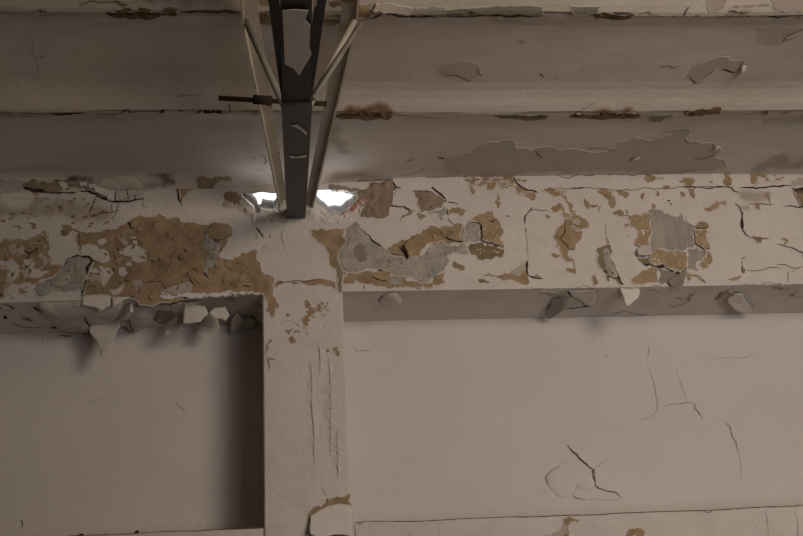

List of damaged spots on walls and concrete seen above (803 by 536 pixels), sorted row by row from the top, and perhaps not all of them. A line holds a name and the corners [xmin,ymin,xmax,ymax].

spalling [439,5,545,23]
spalling [570,5,695,21]
crack [0,95,231,119]
spalling [568,101,741,123]
peeling [0,128,733,336]
crack [506,173,803,287]
crack [527,283,696,308]
peeling [285,300,329,343]
peeling [89,318,120,357]
peeling [306,493,354,536]
crack [354,505,802,536]
peeling [626,527,646,536]